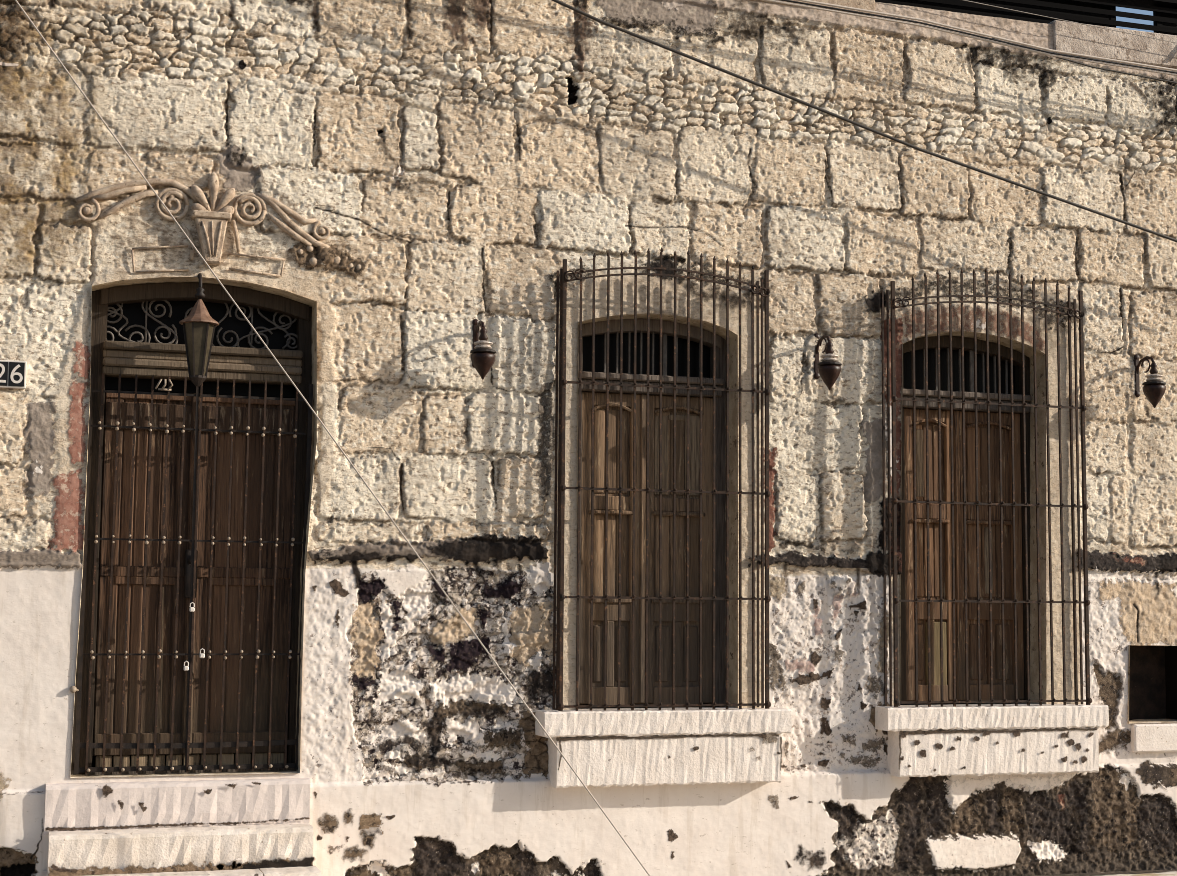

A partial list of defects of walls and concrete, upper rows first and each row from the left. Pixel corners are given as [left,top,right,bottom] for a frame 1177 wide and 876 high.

water stain [0,0,30,73]
water stain [287,0,319,39]
water stain [444,0,494,47]
peeling [33,341,91,553]
peeling [769,575,867,691]
flaking render [1088,566,1177,646]
flaking render [312,560,557,787]
flaking render [750,612,1177,876]
peeling [95,785,124,810]
flaking render [0,802,601,876]